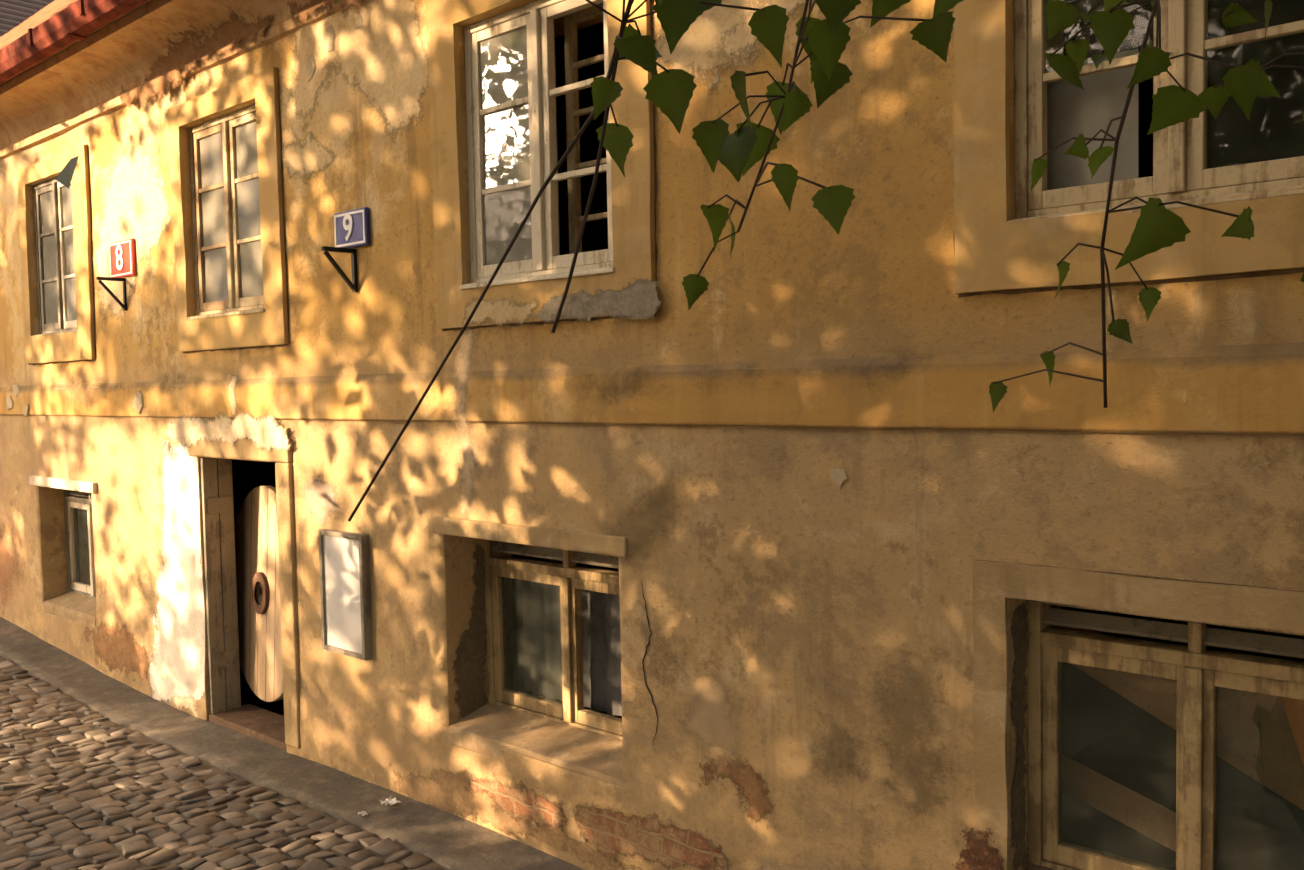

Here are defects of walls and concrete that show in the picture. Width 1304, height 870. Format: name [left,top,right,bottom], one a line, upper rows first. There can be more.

flaking render [120,8,274,108]
peeling [282,0,429,180]
peeling [650,0,810,90]
peeling [462,278,661,326]
peeling [452,544,487,718]
crack [641,581,658,746]
peeling [952,600,1029,870]
flaking render [389,763,730,870]
flaking render [699,754,775,826]